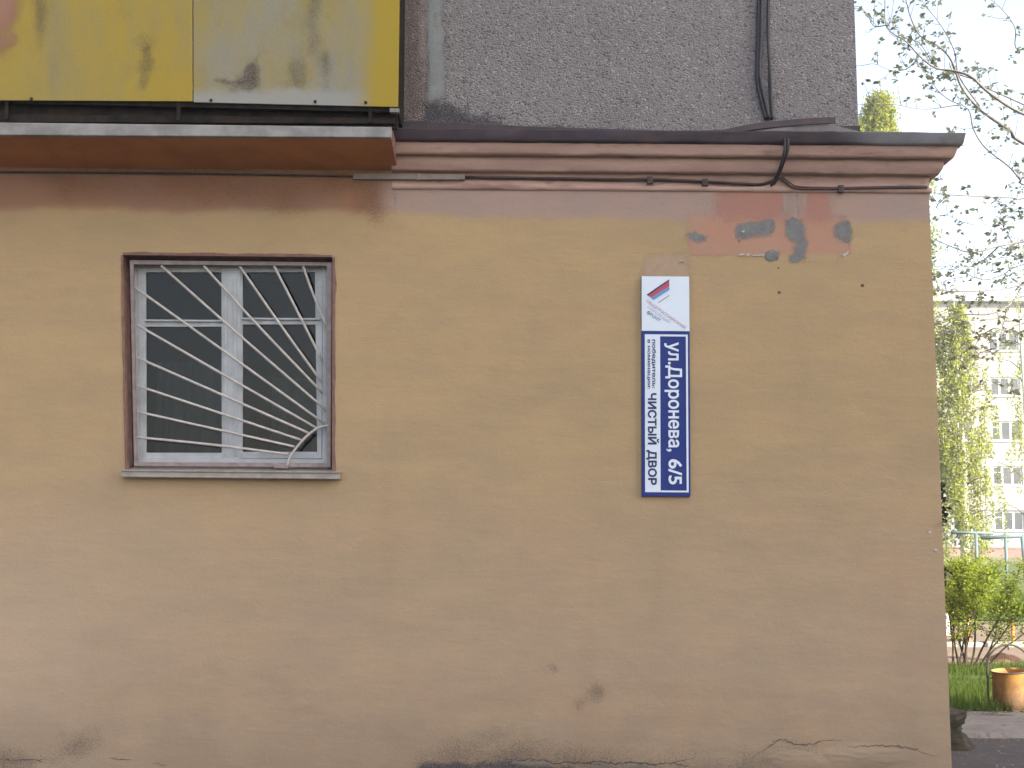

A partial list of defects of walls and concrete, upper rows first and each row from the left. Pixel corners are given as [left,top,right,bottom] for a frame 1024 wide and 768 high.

crack [756,739,933,756]